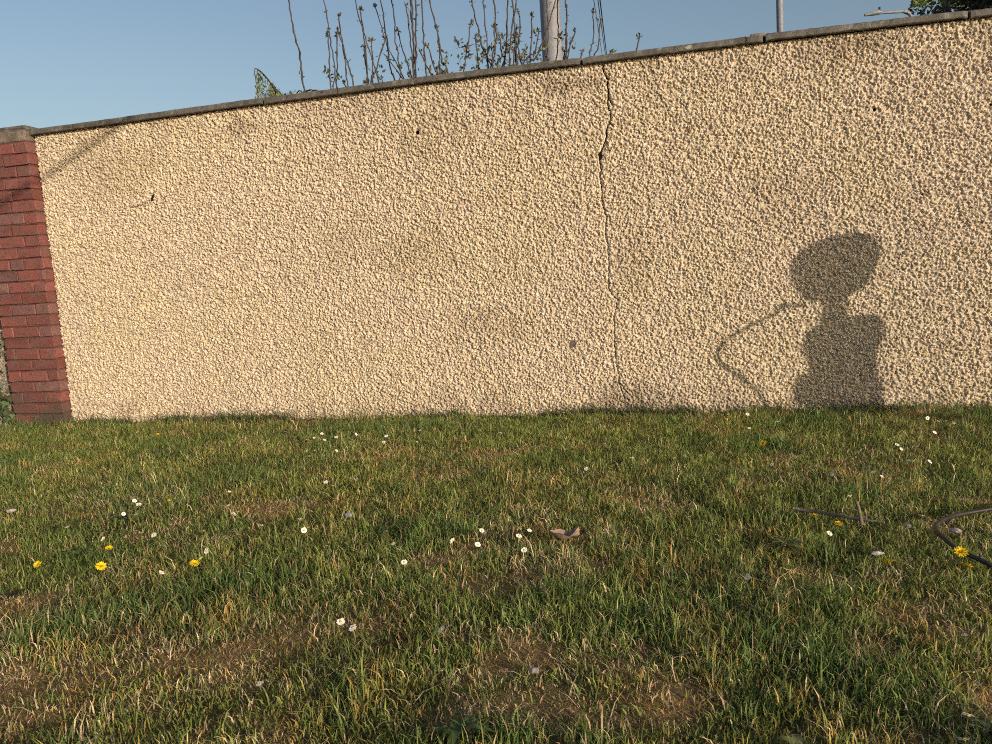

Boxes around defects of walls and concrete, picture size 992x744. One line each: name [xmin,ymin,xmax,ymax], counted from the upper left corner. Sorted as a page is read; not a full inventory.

crack [598,65,628,398]